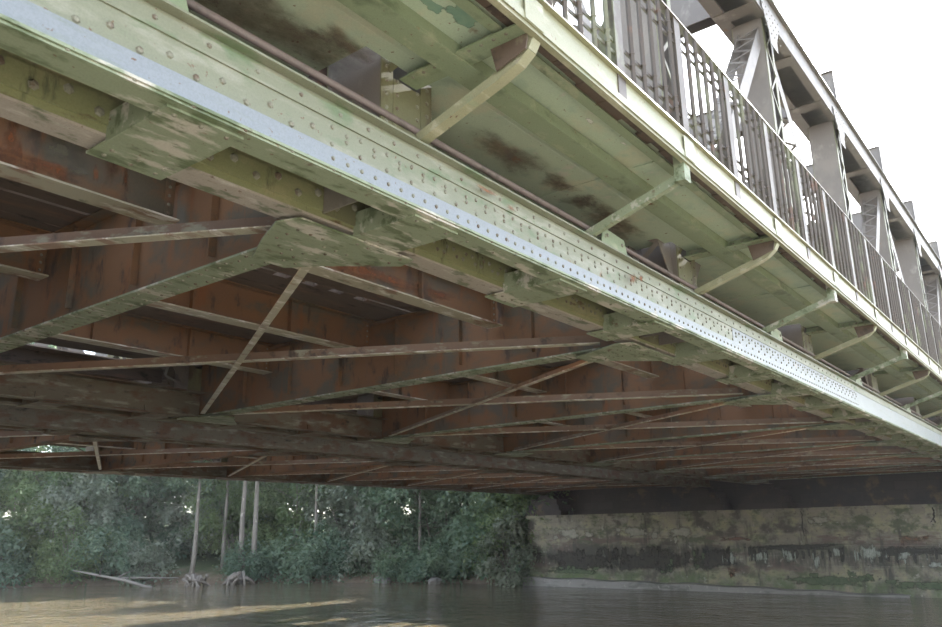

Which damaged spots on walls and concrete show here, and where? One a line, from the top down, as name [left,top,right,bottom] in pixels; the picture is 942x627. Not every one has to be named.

rust [199,0,365,59]
peeling [421,0,477,28]
damp [548,527,737,573]
damp [744,544,942,569]